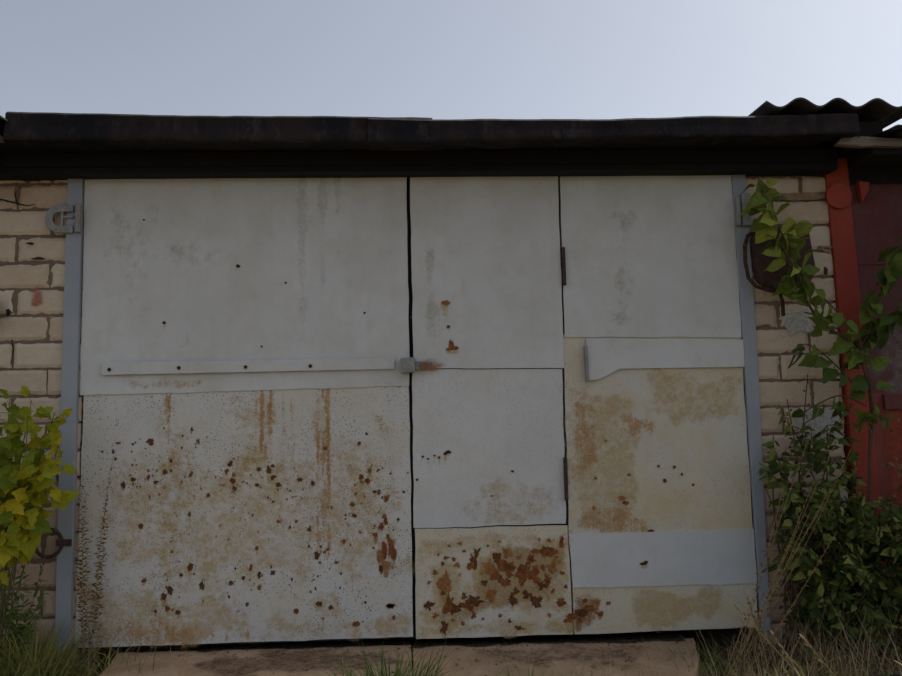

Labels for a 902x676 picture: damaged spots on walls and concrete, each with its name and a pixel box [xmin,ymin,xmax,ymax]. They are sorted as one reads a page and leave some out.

rust [101,388,400,577]
rust [78,519,276,648]
rust [375,603,408,633]
rust [438,536,564,633]